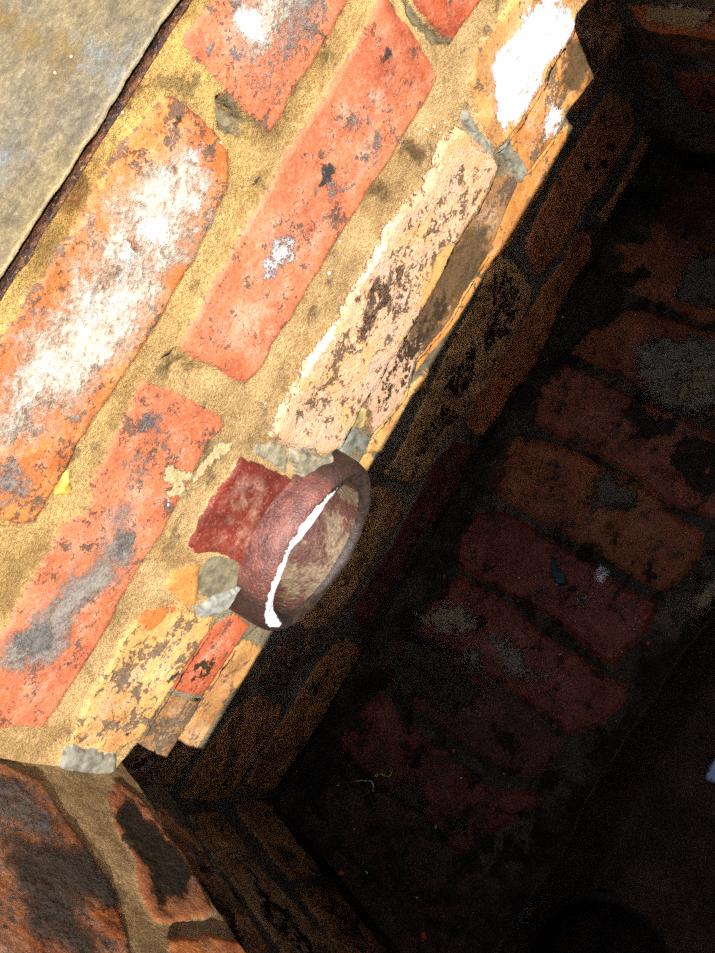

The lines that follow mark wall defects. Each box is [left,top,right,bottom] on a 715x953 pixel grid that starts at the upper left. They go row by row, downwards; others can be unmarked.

leakage [206,0,328,103]
leakage [0,150,209,435]
leakage [122,411,188,490]